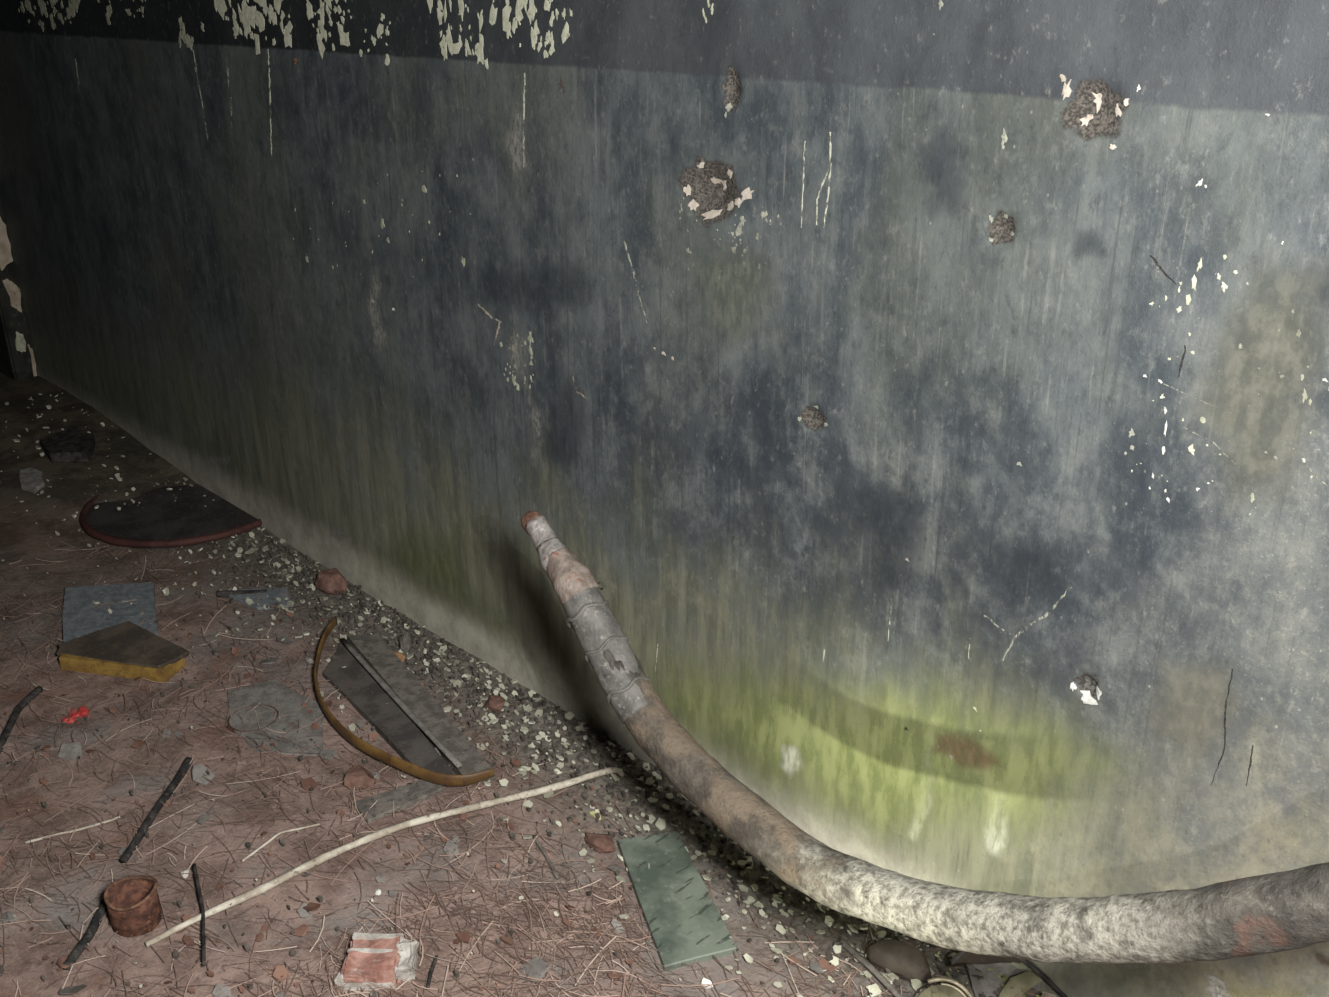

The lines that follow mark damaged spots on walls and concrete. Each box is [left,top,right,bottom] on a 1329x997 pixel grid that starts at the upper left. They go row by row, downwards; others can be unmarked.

peeling [18,0,80,32]
peeling [98,0,146,25]
peeling [178,18,204,50]
peeling [214,0,298,65]
peeling [306,0,391,66]
peeling [427,0,572,69]
spalling [1060,74,1141,150]
spalling [679,157,781,271]
spalling [988,211,1015,245]